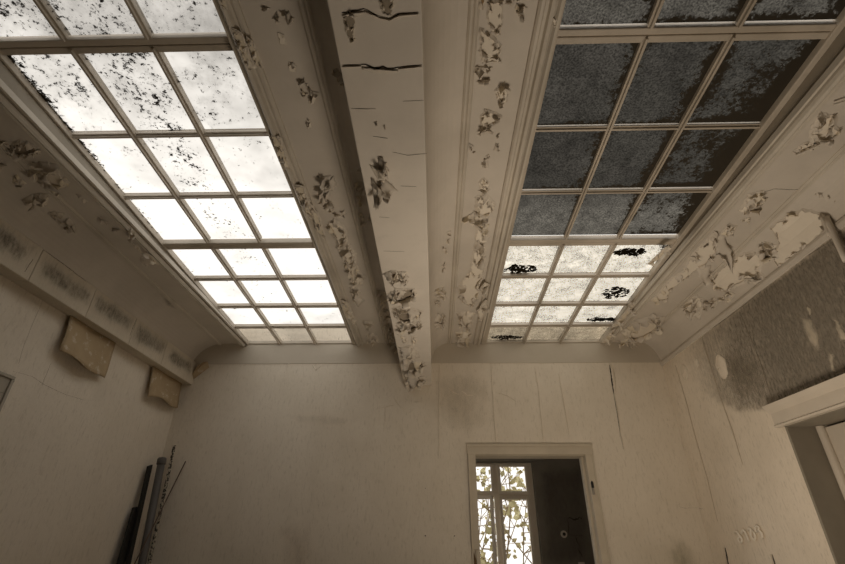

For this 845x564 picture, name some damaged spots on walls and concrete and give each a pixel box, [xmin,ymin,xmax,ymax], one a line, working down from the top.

flaking render [343,11,358,43]
crack [342,8,419,21]
crack [347,64,422,74]
peeling [0,139,70,211]
peeling [271,135,291,170]
peeling [354,157,398,228]
peeling [455,0,528,347]
peeling [792,100,845,156]
peeling [294,173,366,324]
flaking render [602,190,845,348]
peeling [375,270,428,392]